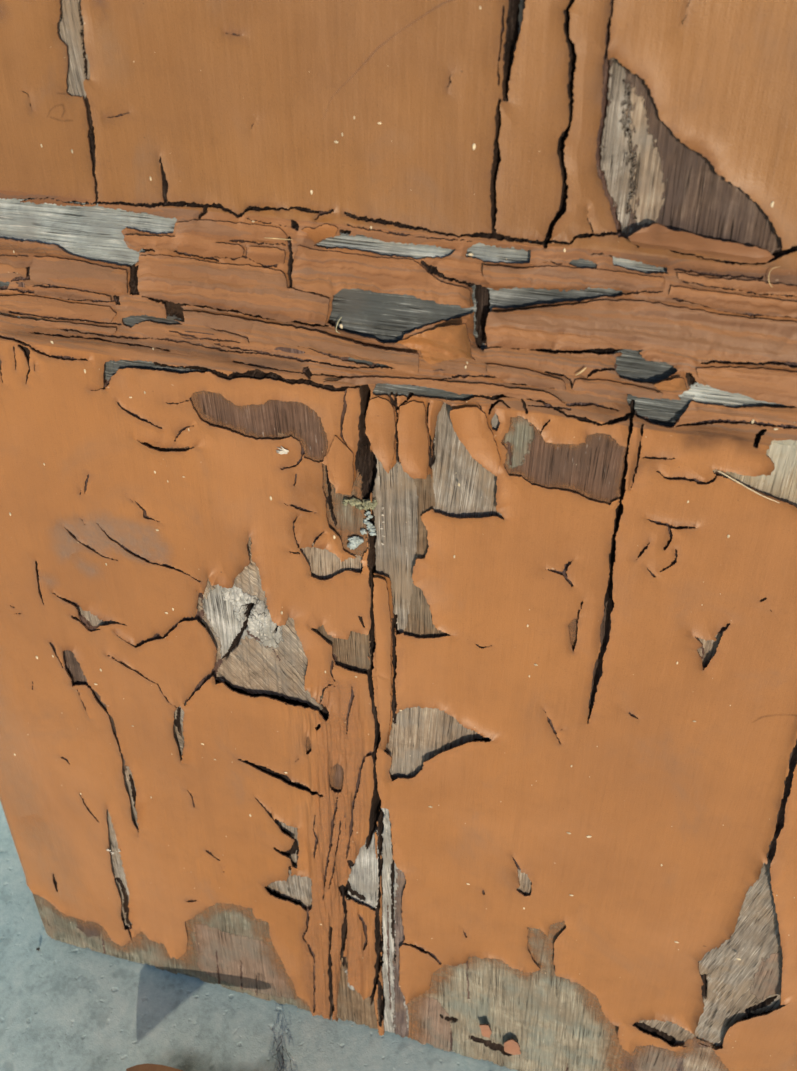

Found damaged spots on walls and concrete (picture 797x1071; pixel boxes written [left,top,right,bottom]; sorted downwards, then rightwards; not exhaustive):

peeling [58,0,90,99]
crack [0,0,639,445]
peeling [597,58,782,264]
crack [624,246,797,317]
crack [35,561,43,599]
crack [69,523,200,581]
peeling [0,198,797,780]
crack [389,346,797,724]
peeling [50,642,139,832]
peeling [32,763,347,1012]
peeling [337,808,783,1071]
crack [767,741,797,862]